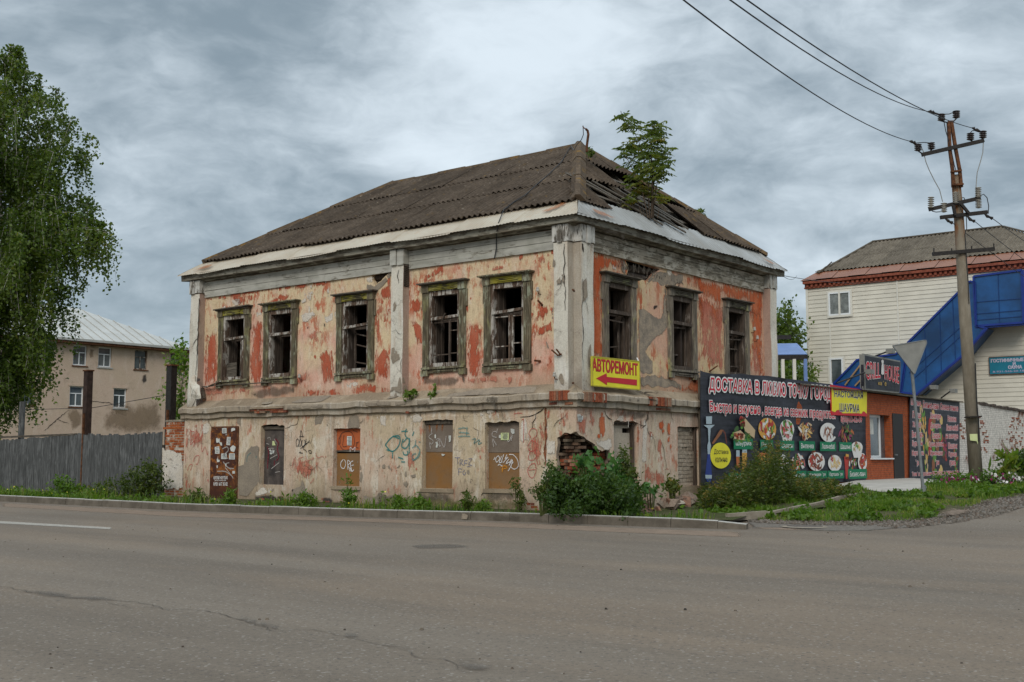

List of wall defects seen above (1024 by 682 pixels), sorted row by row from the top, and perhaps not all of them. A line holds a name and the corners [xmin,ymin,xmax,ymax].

peeling [196,282,326,405]
peeling [232,272,408,426]
peeling [412,265,443,343]
peeling [466,324,512,384]
peeling [531,306,554,336]
flaking render [637,270,763,487]
damp [106,406,159,430]
flaking render [163,419,205,466]
peeling [382,449,417,487]
spalling [529,374,611,483]